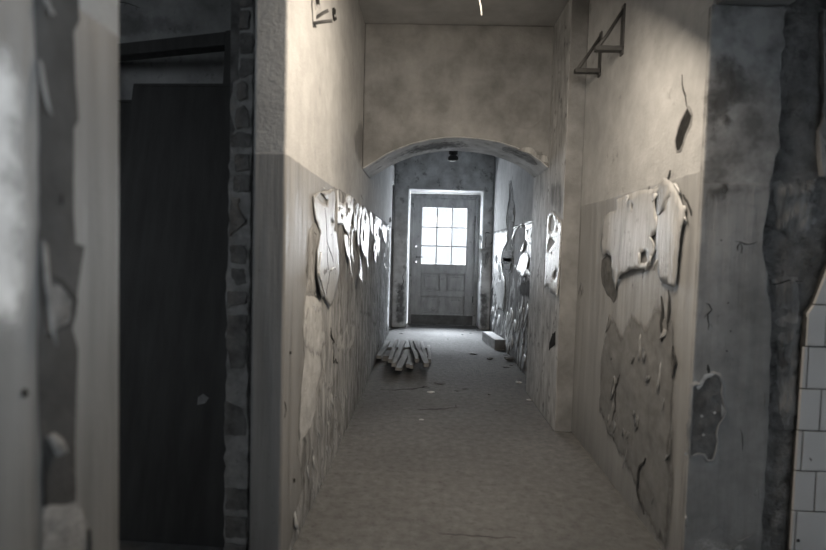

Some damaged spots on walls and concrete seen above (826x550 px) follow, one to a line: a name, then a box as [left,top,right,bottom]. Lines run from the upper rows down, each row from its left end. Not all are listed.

peeling [38,59,53,115]
spalling [42,240,73,346]
flaking render [478,180,532,383]
peeling [544,211,562,297]
flaking render [601,254,618,303]
flaking render [288,187,390,550]
spalling [684,364,729,463]